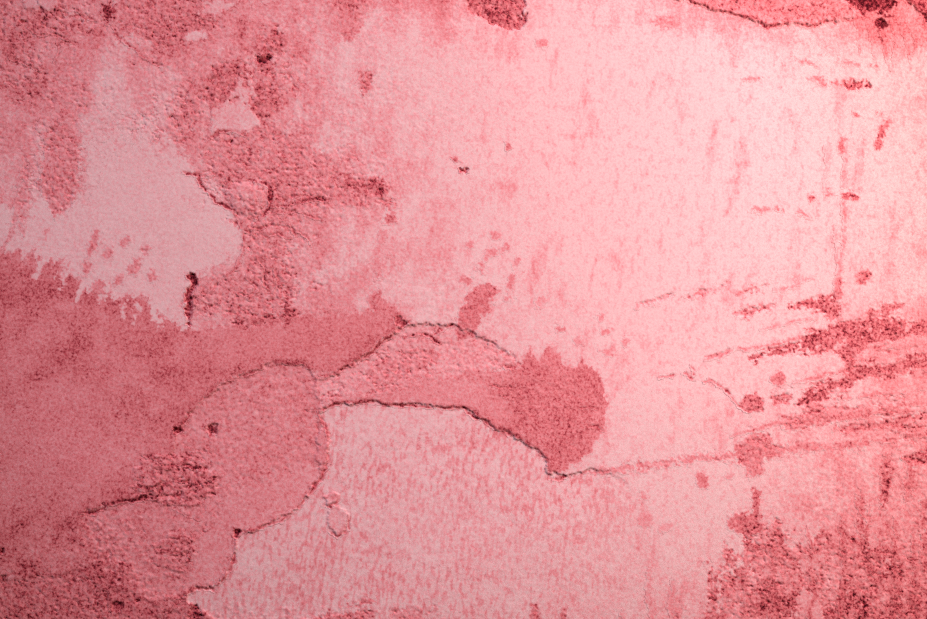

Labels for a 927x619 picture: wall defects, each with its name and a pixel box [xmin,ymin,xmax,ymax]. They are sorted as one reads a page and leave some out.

crack [73,0,161,67]
spalling [113,0,241,55]
spalling [465,0,530,31]
crack [684,0,927,32]
spalling [828,77,873,92]
peeling [874,109,894,151]
spalling [195,21,401,331]
crack [171,314,455,437]
crack [489,361,526,401]
peeling [0,228,927,619]
crack [78,453,218,521]
crack [163,397,575,619]